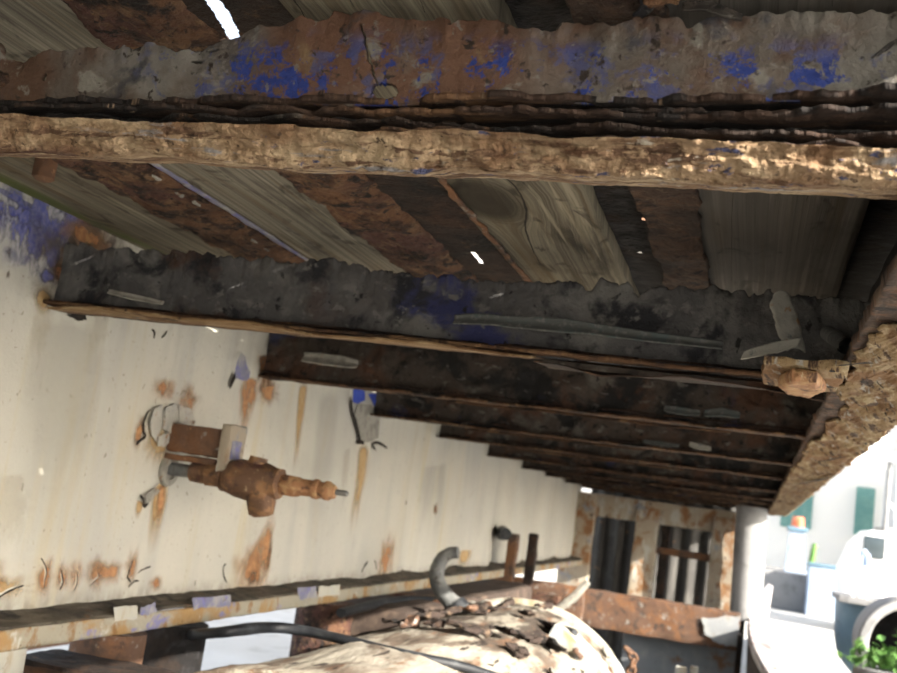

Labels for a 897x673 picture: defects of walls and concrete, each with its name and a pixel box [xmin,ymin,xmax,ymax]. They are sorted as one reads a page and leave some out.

peeling [871,38,897,59]
peeling [0,186,87,282]
corrosion [135,423,167,455]
peeling [350,389,388,451]
corrosion [355,447,367,502]
corrosion [136,484,166,523]
corrosion [242,528,272,584]